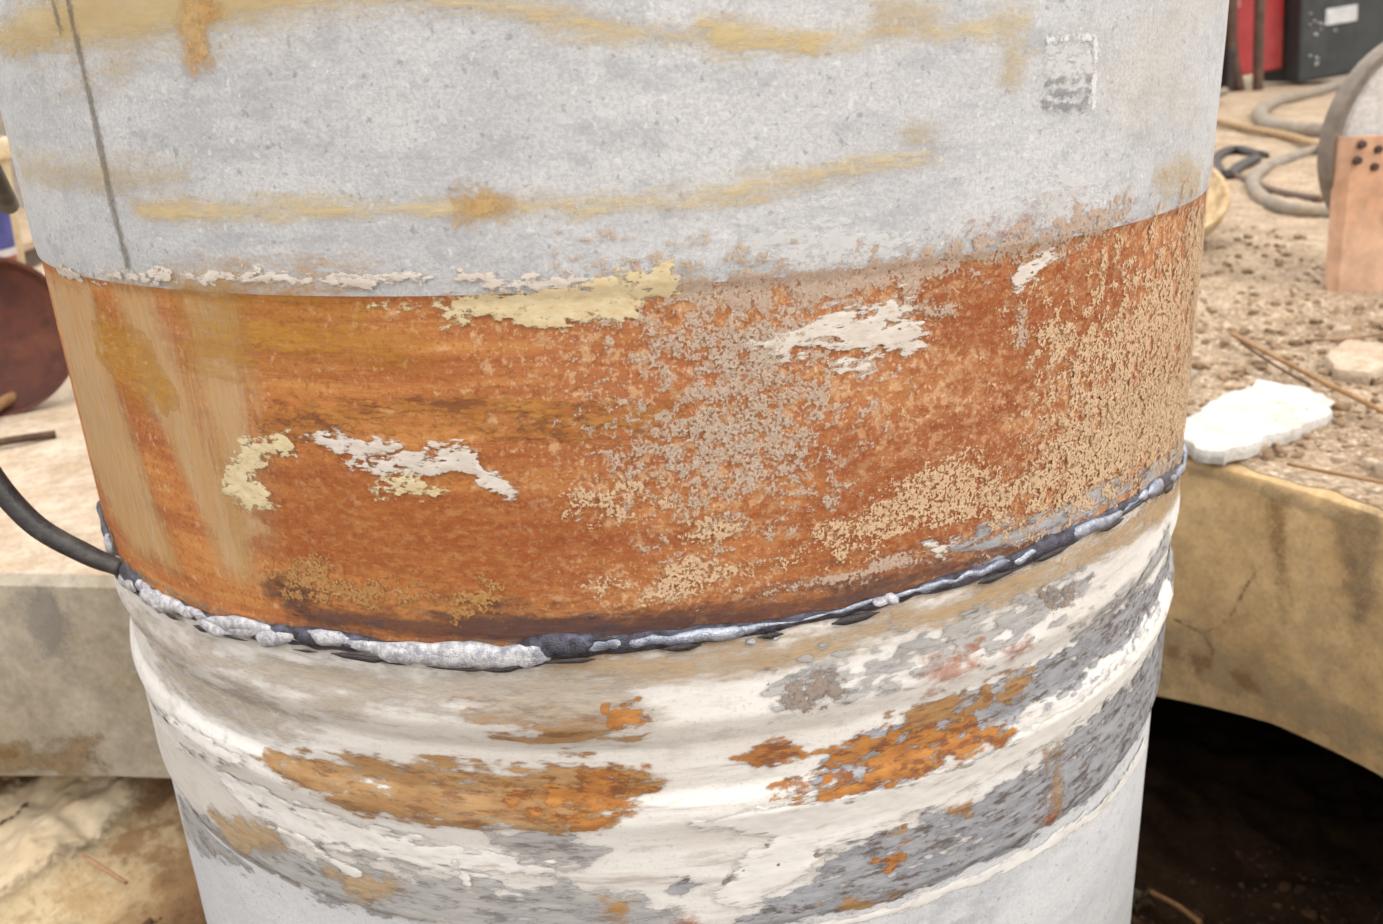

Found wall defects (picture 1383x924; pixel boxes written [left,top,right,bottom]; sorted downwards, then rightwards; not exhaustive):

crack [1174,572,1255,668]